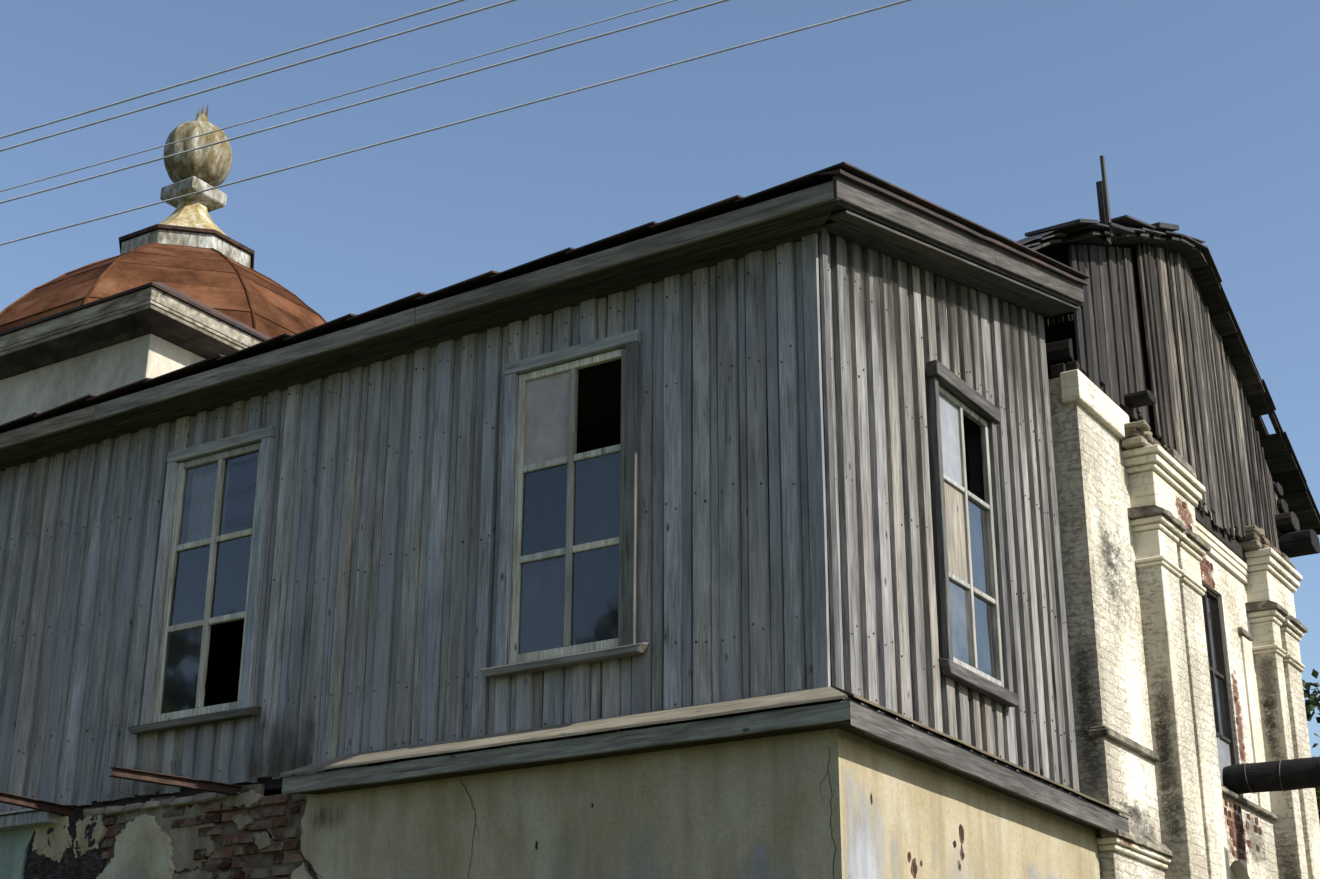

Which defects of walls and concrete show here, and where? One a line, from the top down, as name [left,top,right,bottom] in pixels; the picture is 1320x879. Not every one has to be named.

spalling [1175,496,1193,531]
spalling [1200,556,1216,590]
leakage [1158,689,1179,835]
spalling [1231,672,1246,762]
flaking render [32,784,315,879]
crack [820,746,836,878]
leakage [1124,803,1153,837]
spalling [1224,798,1265,864]